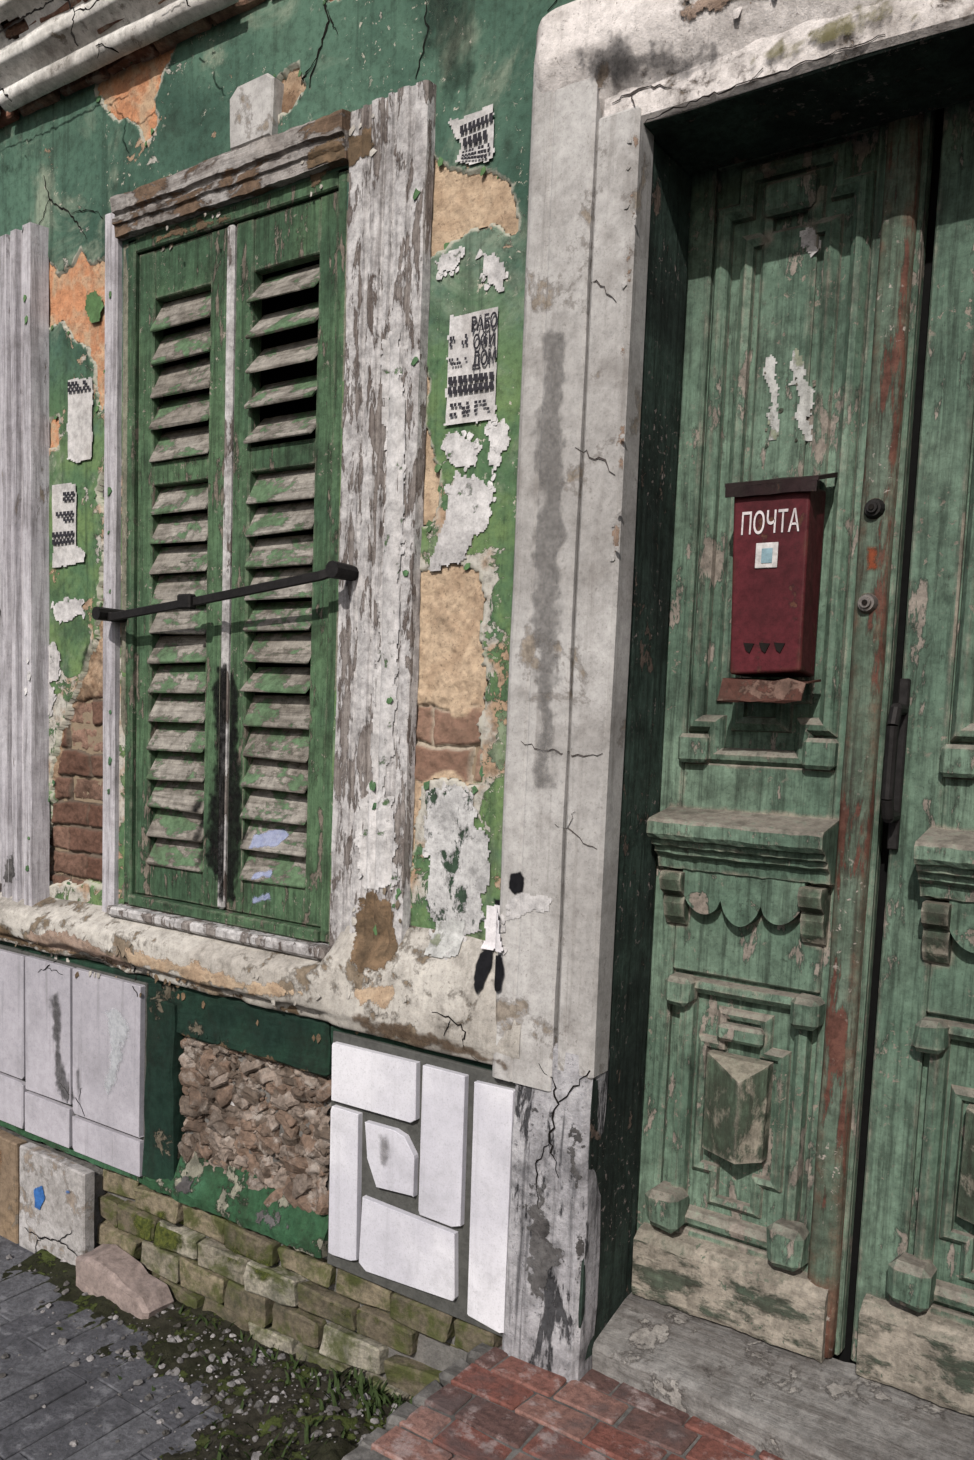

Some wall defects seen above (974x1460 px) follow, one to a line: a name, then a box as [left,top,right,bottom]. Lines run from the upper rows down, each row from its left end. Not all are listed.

crack [0,0,119,58]
flaking render [96,48,175,146]
crack [299,0,338,100]
flaking render [680,0,751,22]
crack [22,175,101,237]
flaking render [413,157,519,292]
peeling [49,252,111,412]
flaking render [345,329,552,1015]
flaking render [24,586,112,885]
peeling [3,855,29,886]
crack [535,1064,590,1209]